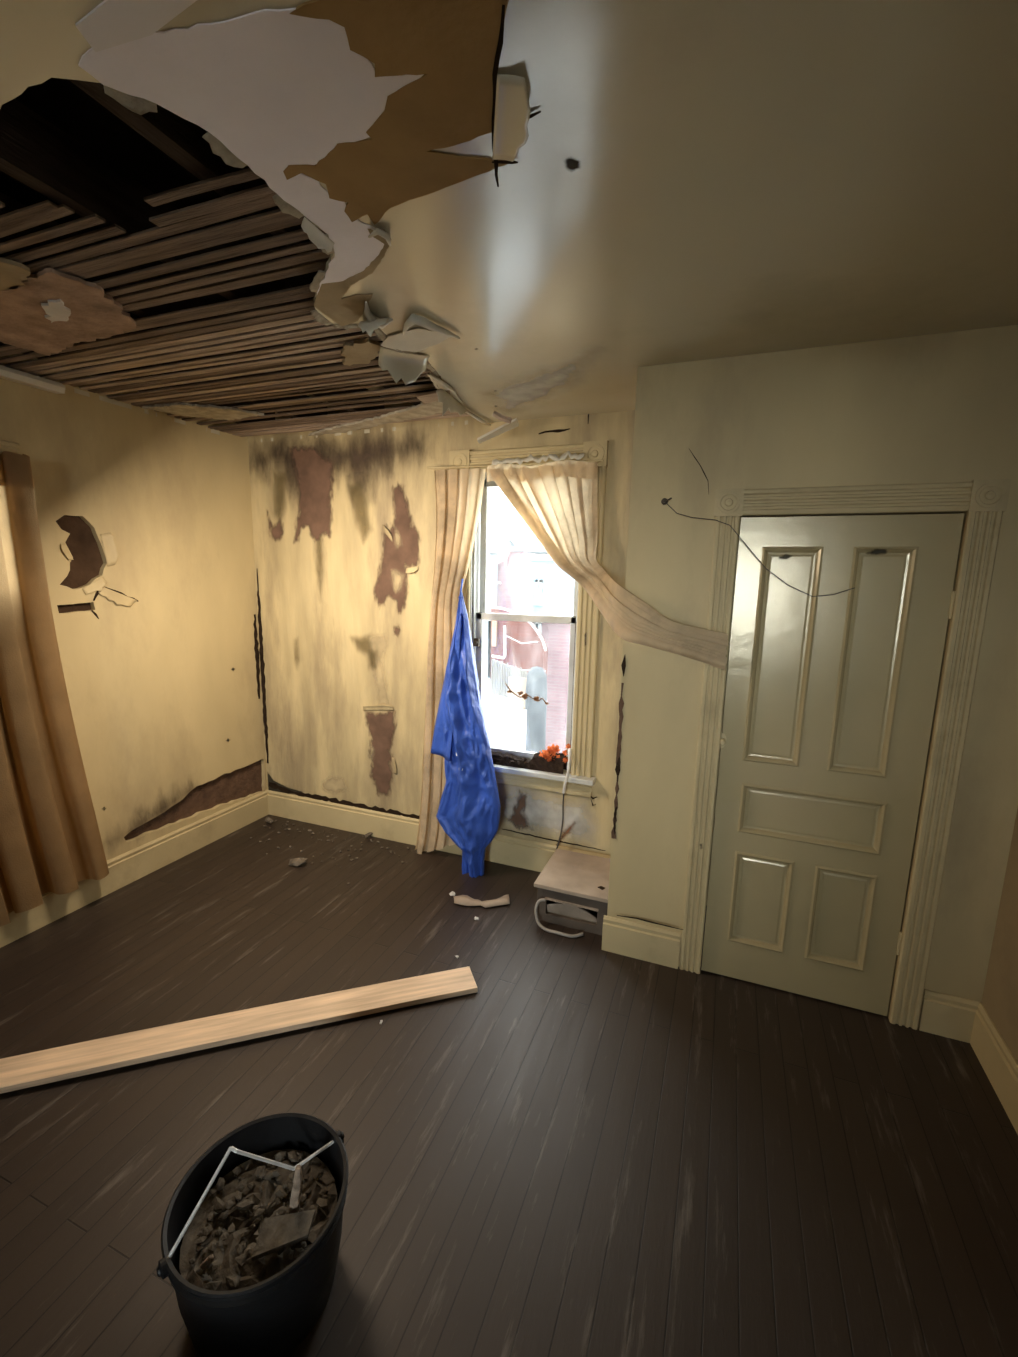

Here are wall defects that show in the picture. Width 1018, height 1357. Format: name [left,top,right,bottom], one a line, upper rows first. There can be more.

peeling [78,0,530,426]
water stain [255,441,301,517]
peeling [267,447,334,541]
water stain [313,437,422,535]
hole [56,515,138,619]
peeling [374,484,419,636]
water stain [356,637,388,704]
peeling [363,705,397,796]